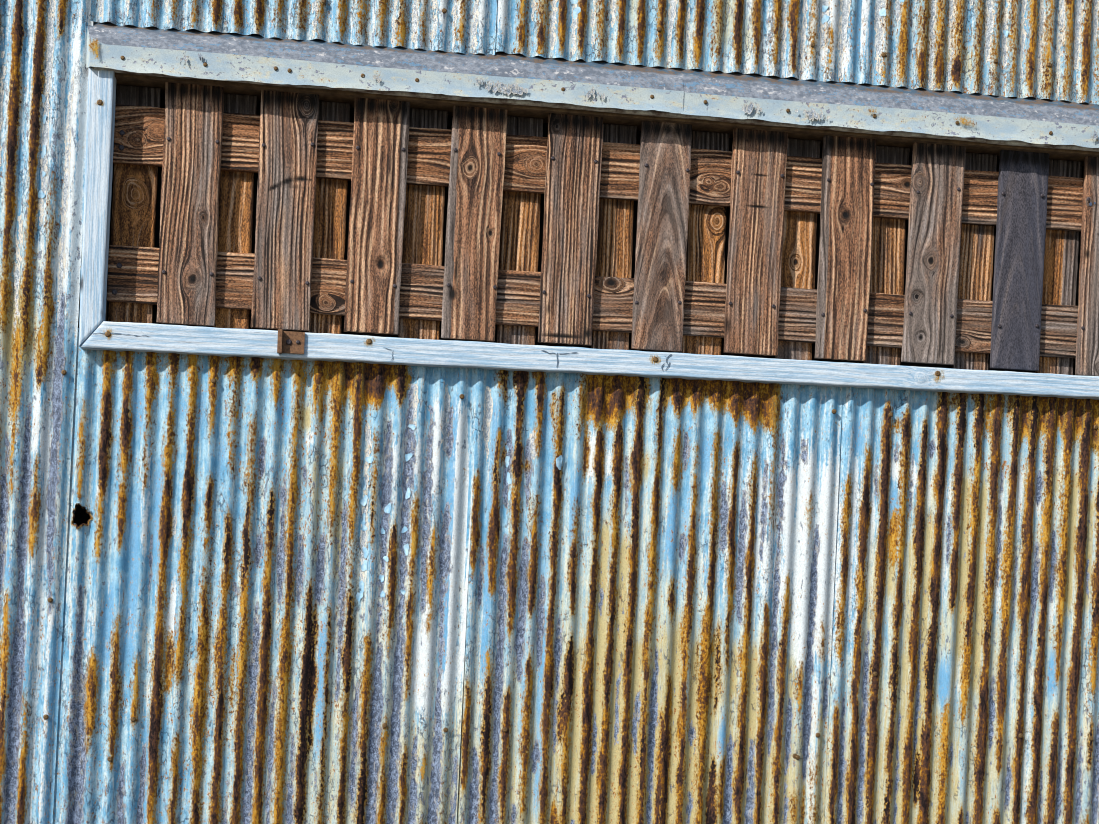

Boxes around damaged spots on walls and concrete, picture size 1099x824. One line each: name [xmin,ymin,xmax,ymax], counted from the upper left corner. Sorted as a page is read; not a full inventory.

rust [149,0,431,48]
rust [447,0,471,52]
rust [512,0,838,79]
rust [878,0,1099,103]
rust [0,0,68,504]
rust [28,455,42,558]
rust [76,330,440,824]
rust [420,370,1099,824]
rust [0,594,33,824]